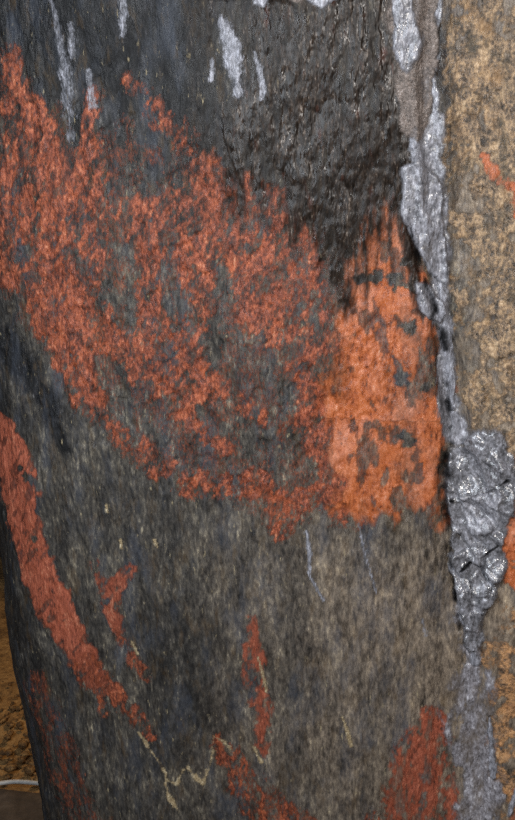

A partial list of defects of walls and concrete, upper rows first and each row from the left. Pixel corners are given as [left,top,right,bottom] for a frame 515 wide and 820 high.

damp [197,0,451,319]
corrosion [480,152,515,218]
corrosion [0,44,451,543]
damp [431,271,468,446]
corrosion [0,412,156,742]
damp [305,530,324,601]
corrosion [502,518,515,590]
corrosion [212,733,300,820]
corrosion [242,616,273,757]
corrosion [365,706,459,820]
efflorescence [439,600,515,820]